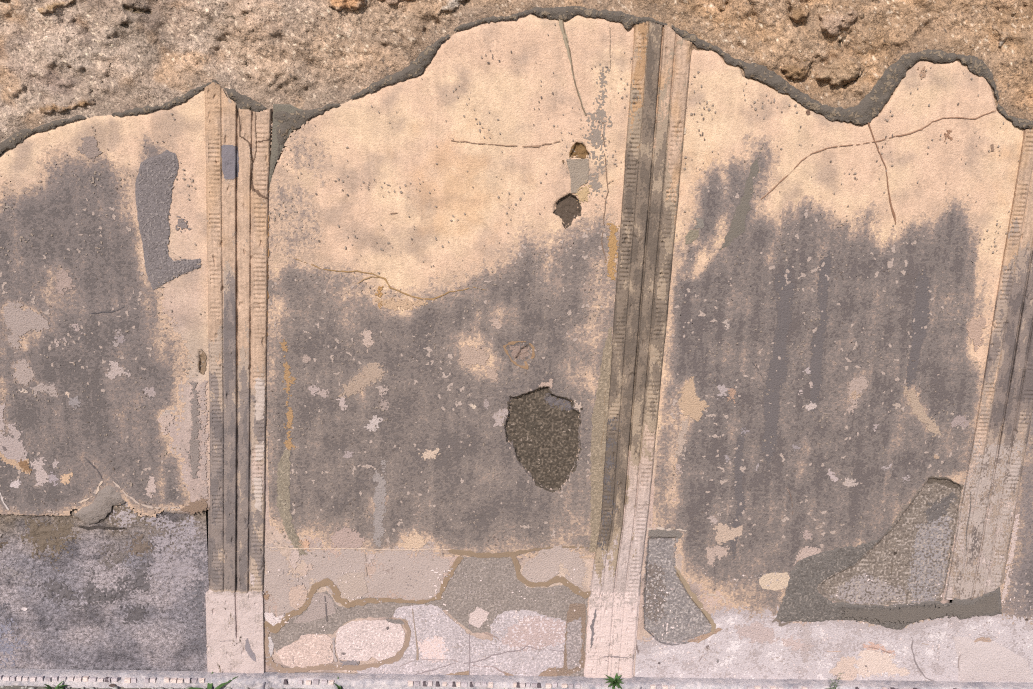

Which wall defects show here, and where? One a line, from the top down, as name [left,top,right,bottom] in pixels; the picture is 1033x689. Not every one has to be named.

crack [559,19,586,115]
spalling [553,193,582,228]
spalling [569,142,589,159]
crack [601,134,614,261]
crack [761,110,996,224]
leakage [0,131,206,617]
leakage [187,21,1033,673]
spalling [470,378,582,492]
leakage [120,603,149,626]
spalling [264,526,566,688]
peeling [521,436,1033,689]
leakage [829,648,910,680]